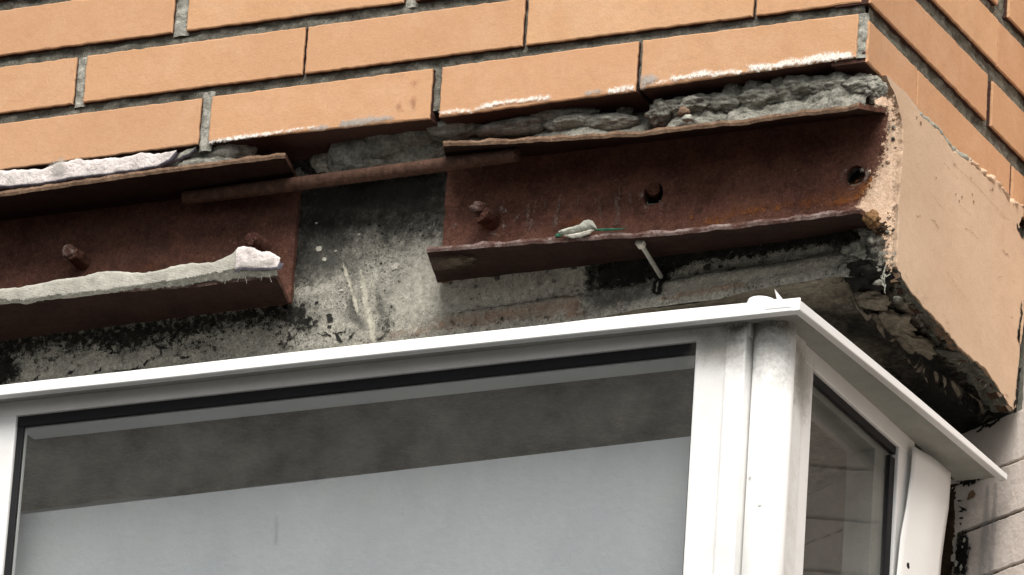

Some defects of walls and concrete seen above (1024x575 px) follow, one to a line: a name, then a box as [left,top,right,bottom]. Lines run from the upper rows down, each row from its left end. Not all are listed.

peeling [0,147,199,191]
corrosion [862,209,881,229]
peeling [0,246,284,304]
spalling [840,221,937,360]
leakage [0,230,1005,434]